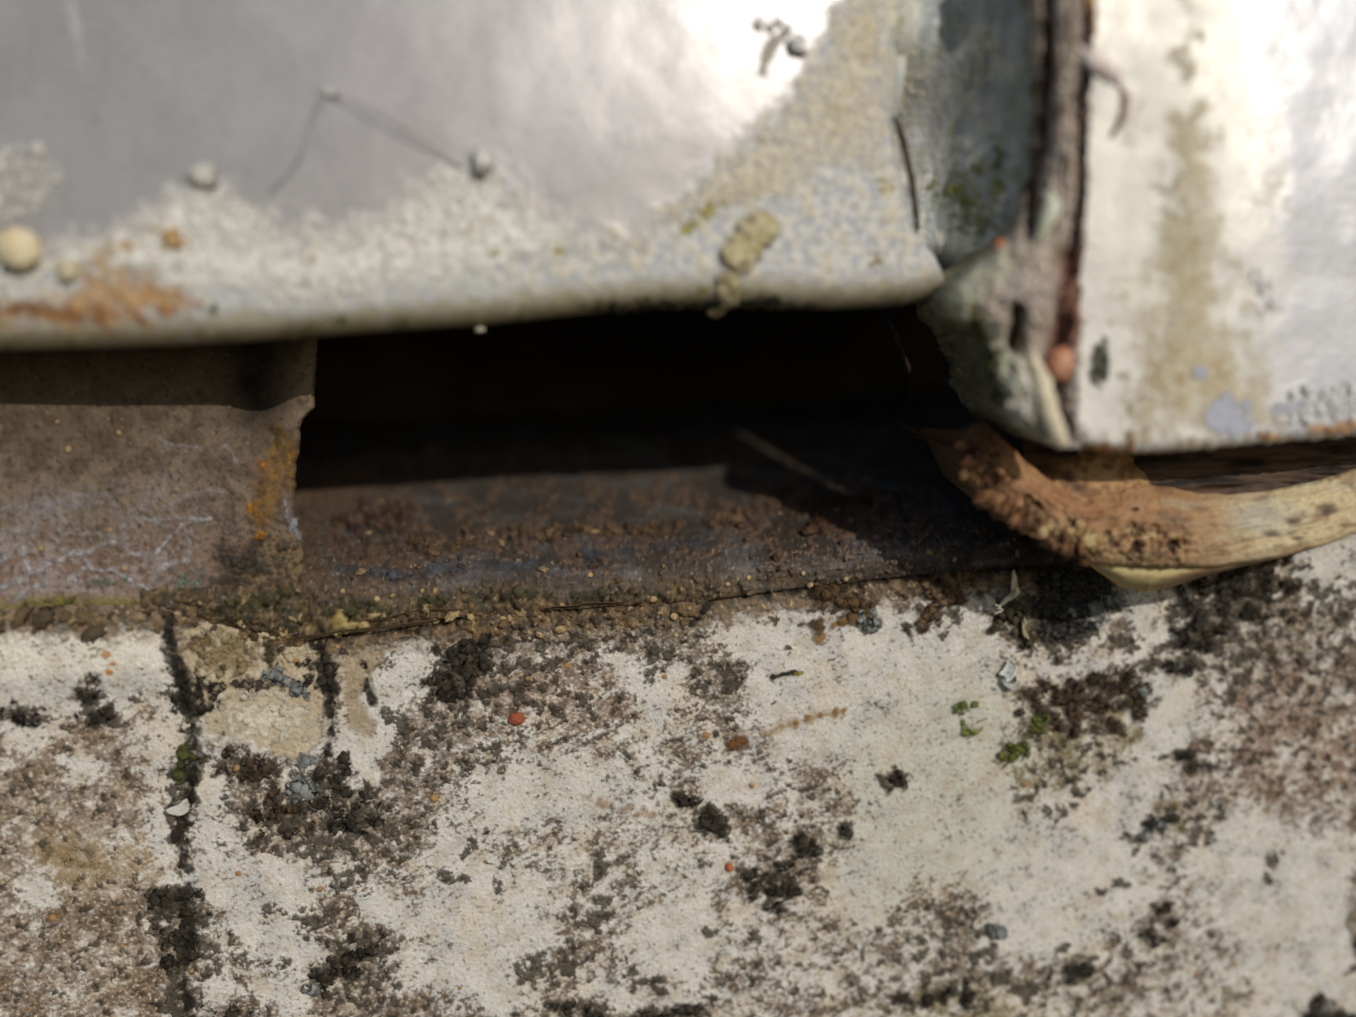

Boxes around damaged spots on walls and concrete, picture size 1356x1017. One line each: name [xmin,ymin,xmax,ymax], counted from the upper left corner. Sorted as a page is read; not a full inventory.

water stain [59,164,585,308]
corrosion [0,239,185,331]
water stain [800,584,875,644]
water stain [903,564,985,639]
water stain [1034,563,1113,642]
crack [0,503,212,1017]